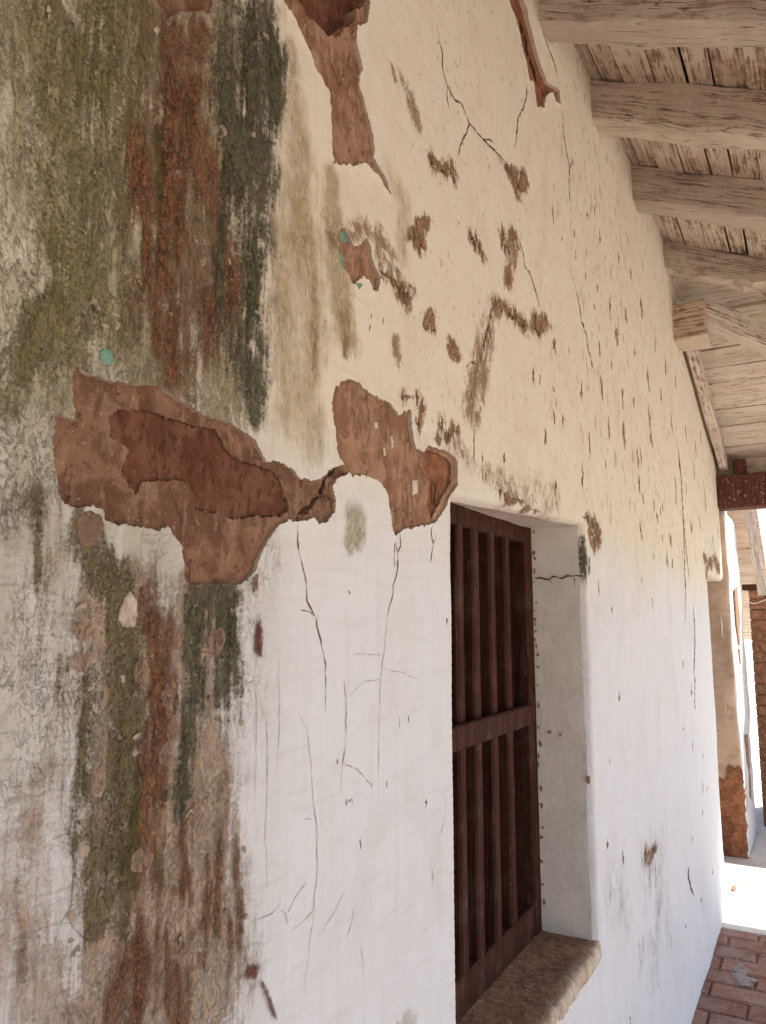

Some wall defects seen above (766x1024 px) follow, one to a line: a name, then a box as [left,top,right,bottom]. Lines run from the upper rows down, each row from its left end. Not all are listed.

flaking render [284,0,393,198]
crack [437,26,528,164]
flaking render [510,0,561,108]
damp [208,0,308,432]
damp [294,169,412,360]
flaking render [339,227,416,307]
flaking render [52,364,461,586]
damp [79,670,142,867]
damp [167,583,244,828]
crack [252,675,363,980]
crack [297,535,413,804]
crack [535,575,581,587]